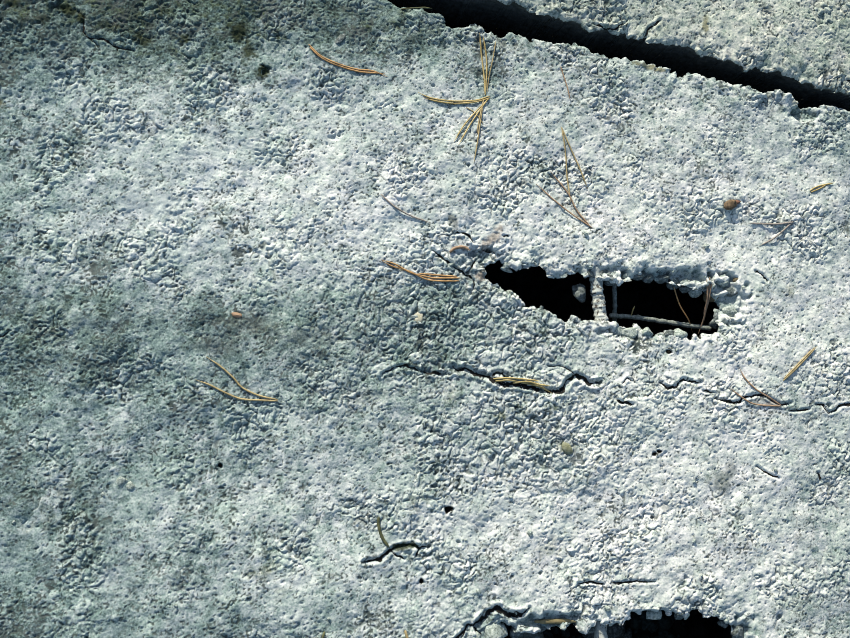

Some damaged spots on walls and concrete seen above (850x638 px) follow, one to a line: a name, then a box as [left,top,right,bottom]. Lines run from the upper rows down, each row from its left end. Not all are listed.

spalling [485,260,738,340]
crack [382,364,598,395]
crack [661,379,850,414]
crack [364,543,430,562]
spalling [473,608,744,638]